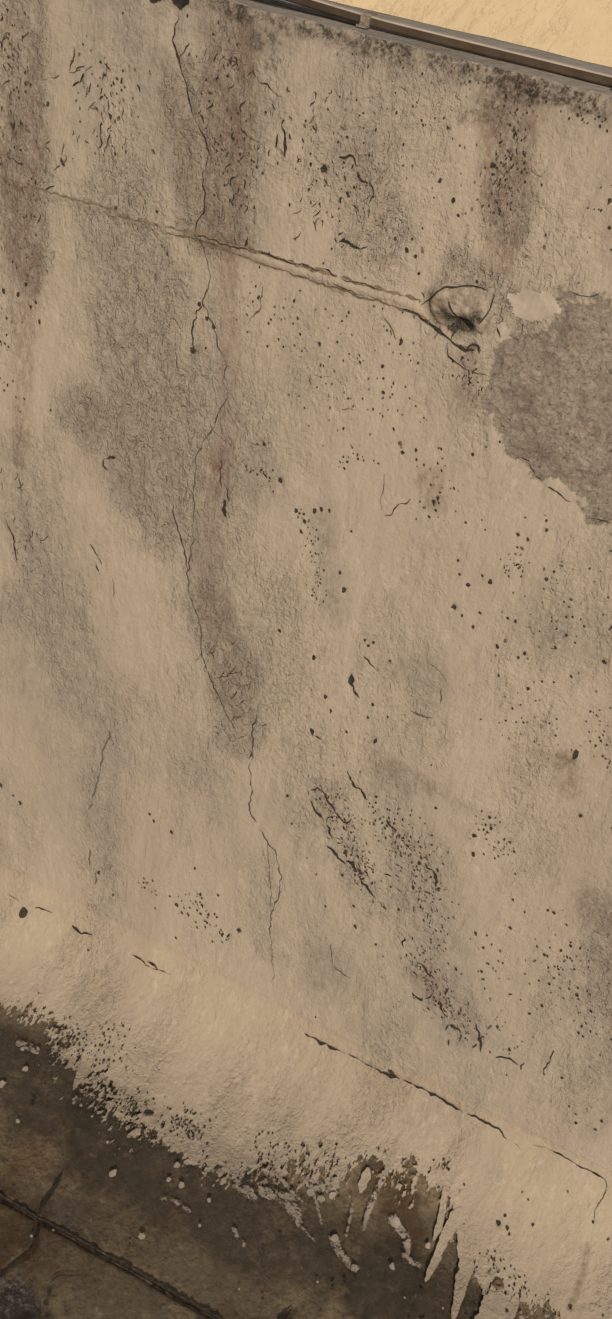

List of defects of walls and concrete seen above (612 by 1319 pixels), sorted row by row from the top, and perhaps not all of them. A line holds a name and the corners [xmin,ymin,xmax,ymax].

crack [0,9,486,979]
peeling [442,284,612,525]
damp [0,1029,477,1319]
crack [305,1034,607,1220]